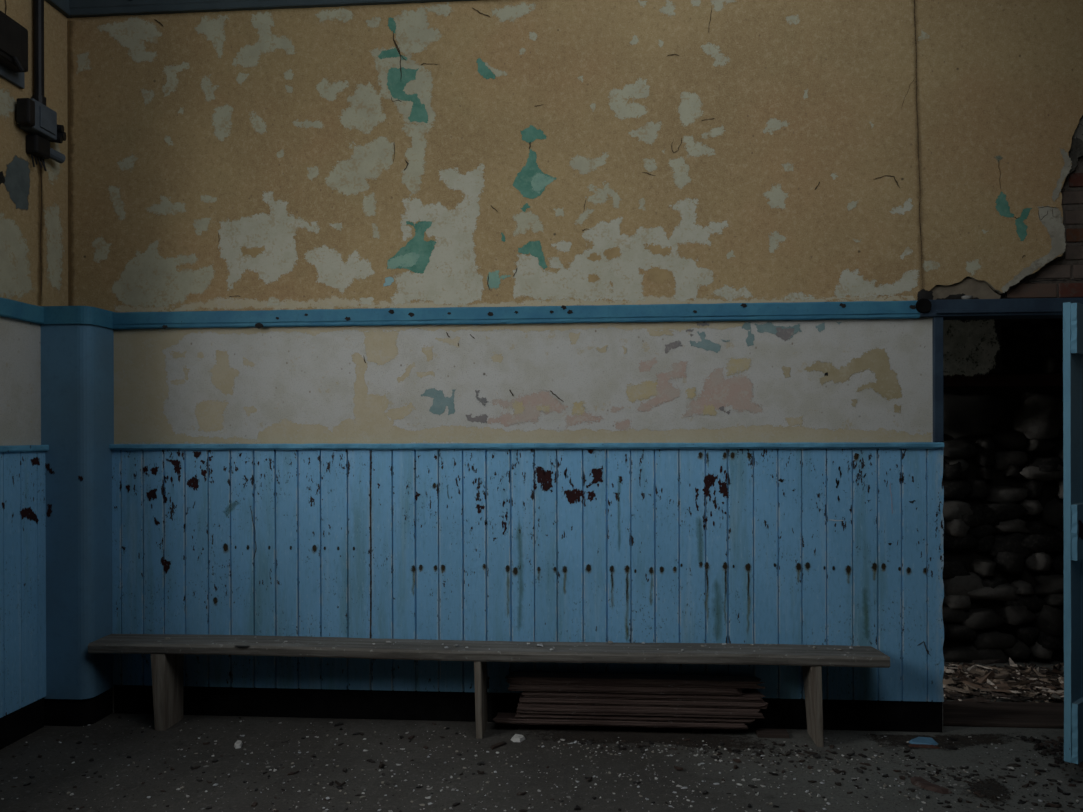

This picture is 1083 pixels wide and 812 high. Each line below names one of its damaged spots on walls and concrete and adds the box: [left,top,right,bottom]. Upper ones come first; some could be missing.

peeling [97,16,190,106]
peeling [112,0,940,312]
crack [875,0,934,300]
flaking render [930,115,1083,300]
peeling [363,330,399,365]
peeling [565,321,710,431]
peeling [114,432,267,503]
peeling [533,466,623,507]
peeling [695,453,729,530]
rust [610,565,636,602]
rust [723,562,750,626]